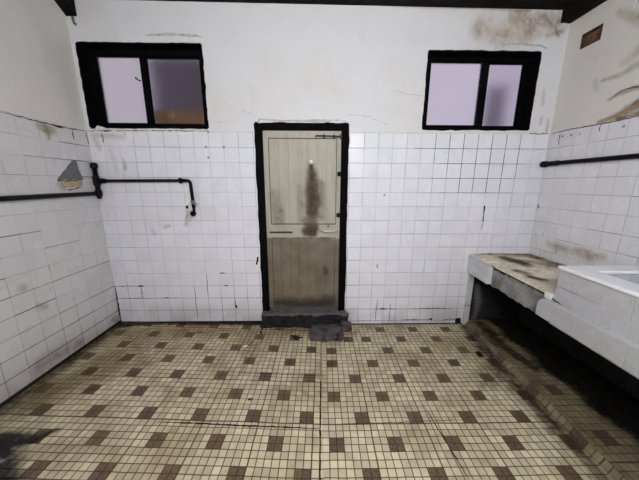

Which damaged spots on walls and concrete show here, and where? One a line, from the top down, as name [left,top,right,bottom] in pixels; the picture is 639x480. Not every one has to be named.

peeling [57,161,83,191]
water stain [477,321,538,371]
crack [165,328,324,480]